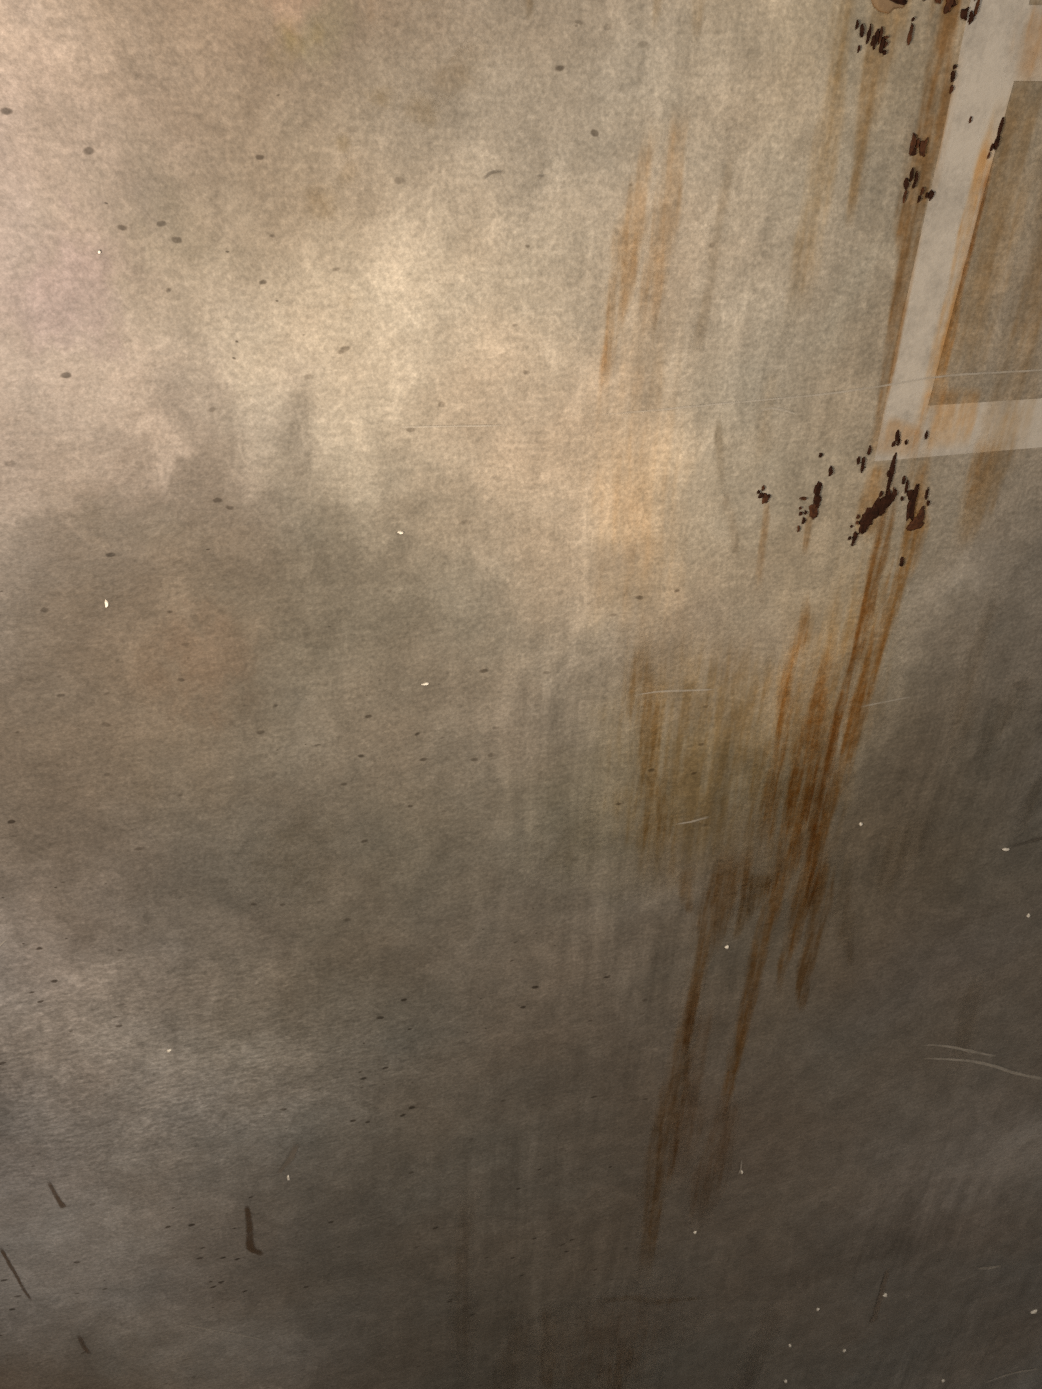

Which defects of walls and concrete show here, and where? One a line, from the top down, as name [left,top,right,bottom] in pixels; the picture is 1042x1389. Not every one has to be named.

spalling [855,0,915,55]
spalling [924,0,980,25]